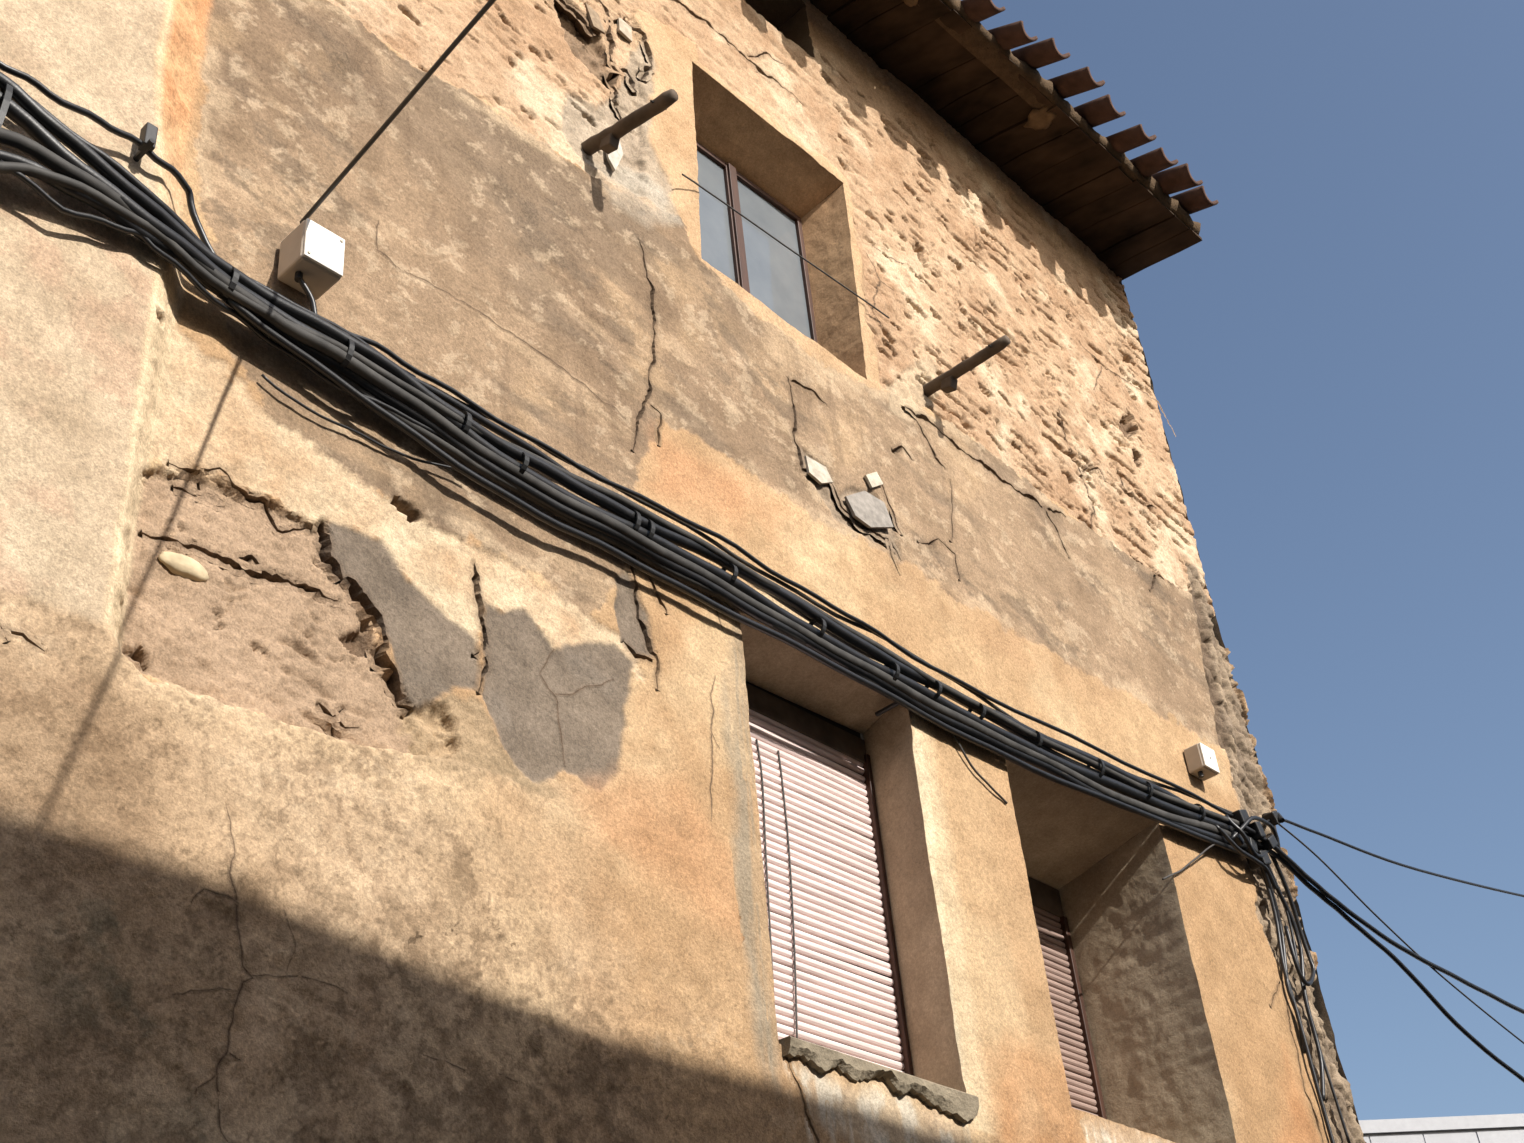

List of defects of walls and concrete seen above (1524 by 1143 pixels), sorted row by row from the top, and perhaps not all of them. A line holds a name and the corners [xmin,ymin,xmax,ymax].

peeling [328,0,678,193]
crack [375,220,666,454]
peeling [117,457,459,759]
crack [467,562,493,697]
crack [538,552,671,767]
peeling [774,0,1366,1143]
leakage [716,619,973,1143]
crack [782,1056,823,1143]